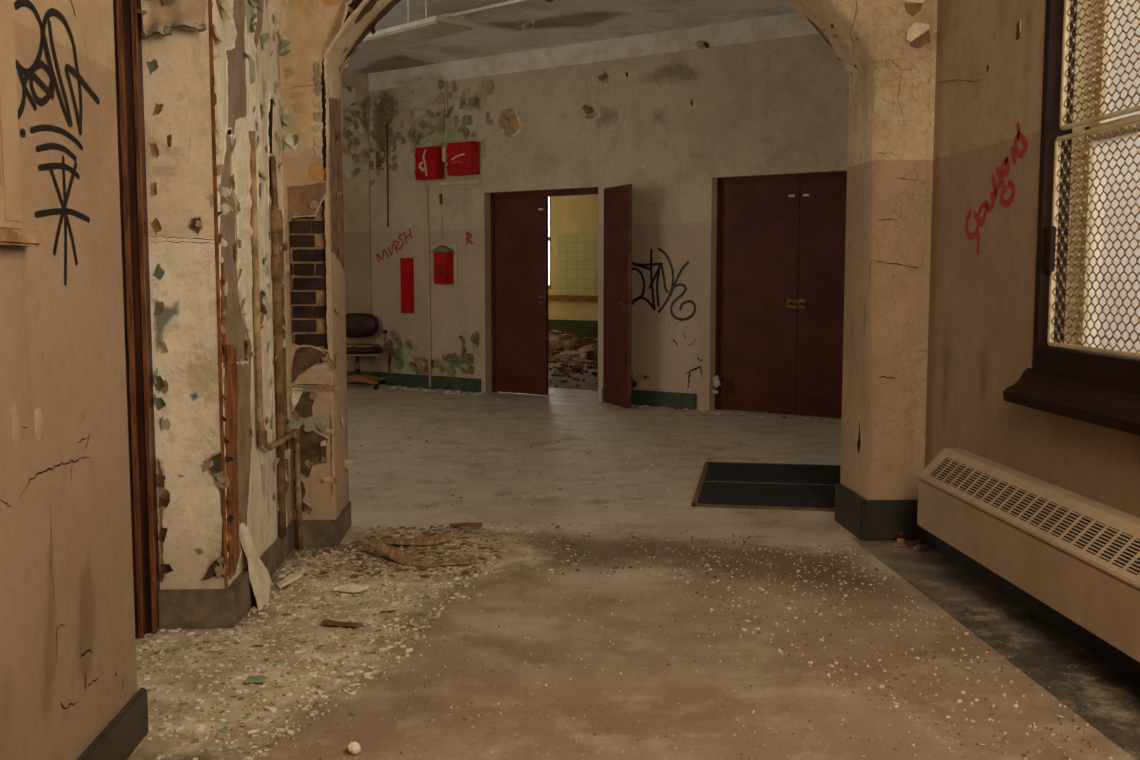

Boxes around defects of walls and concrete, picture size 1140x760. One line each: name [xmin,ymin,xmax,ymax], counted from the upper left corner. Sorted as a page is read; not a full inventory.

peeling [902,0,932,51]
flaking render [137,0,522,585]
crack [0,435,90,507]